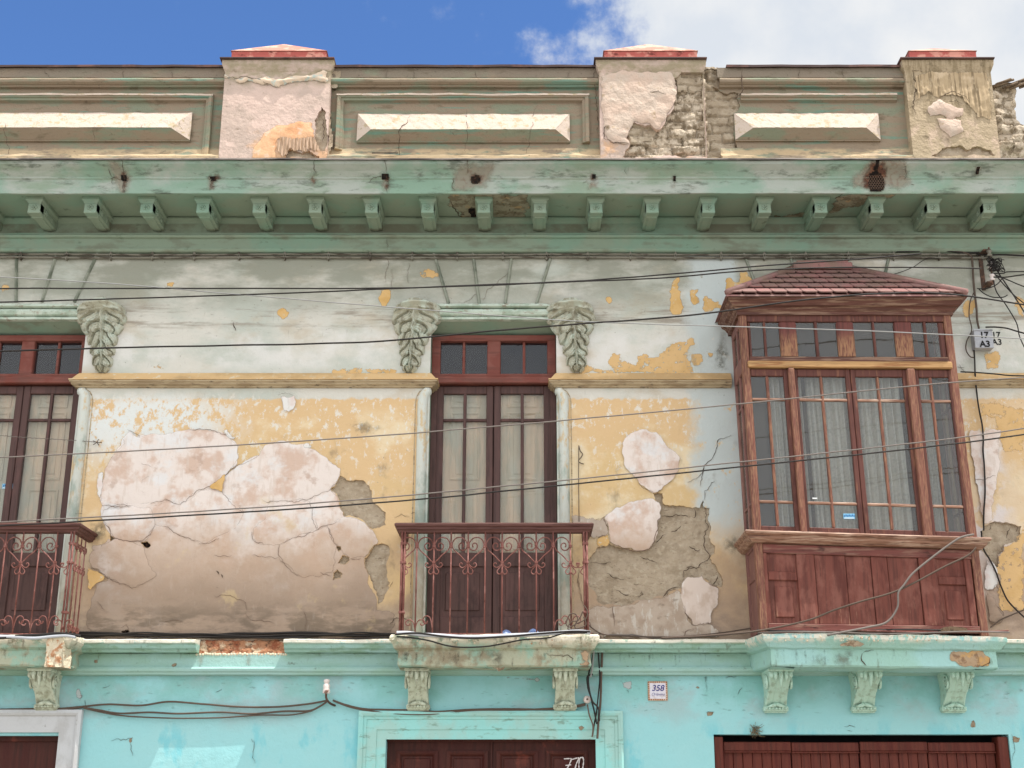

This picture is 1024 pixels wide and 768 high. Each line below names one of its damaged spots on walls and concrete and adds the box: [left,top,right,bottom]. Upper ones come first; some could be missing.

peeling [252,121,320,158]
peeling [601,70,677,144]
flaking render [914,71,993,137]
flaking render [448,194,530,217]
peeling [579,338,713,373]
peeling [571,429,680,551]
peeling [969,402,1024,524]
peeling [86,429,395,656]
peeling [984,529,1024,612]
peeling [578,576,719,639]
spalling [44,637,72,669]
flaking render [893,626,990,667]